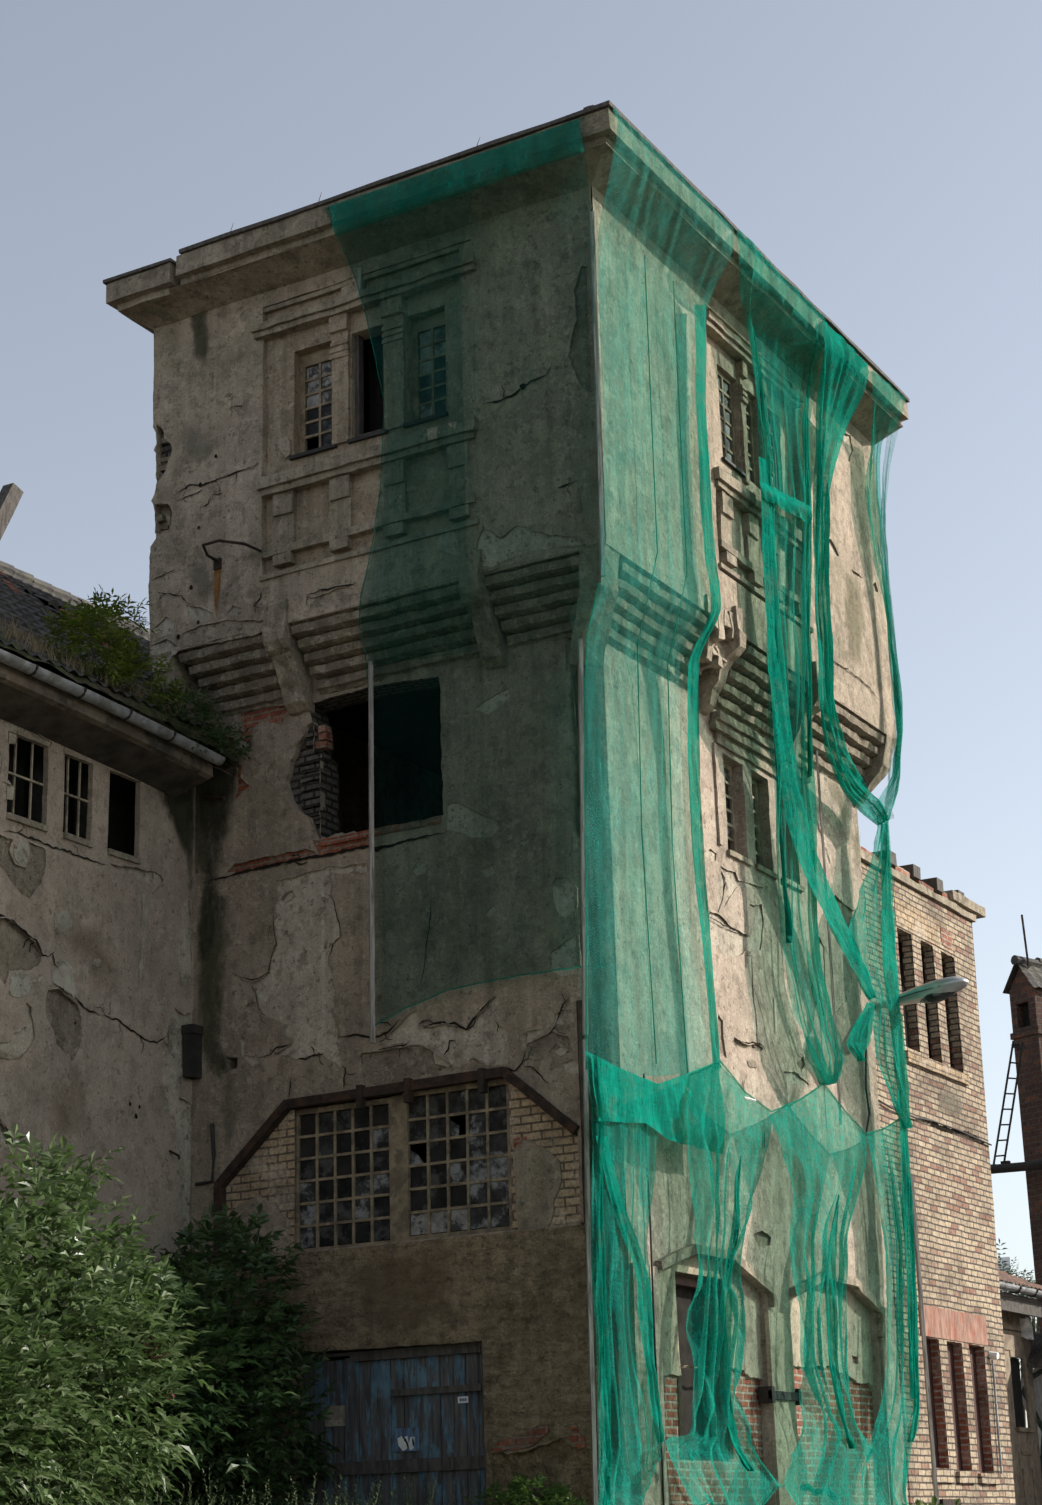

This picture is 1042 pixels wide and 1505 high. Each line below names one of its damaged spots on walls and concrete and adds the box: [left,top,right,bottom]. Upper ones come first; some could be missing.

peeling [229,704,499,1067]
peeling [362,997,579,1086]